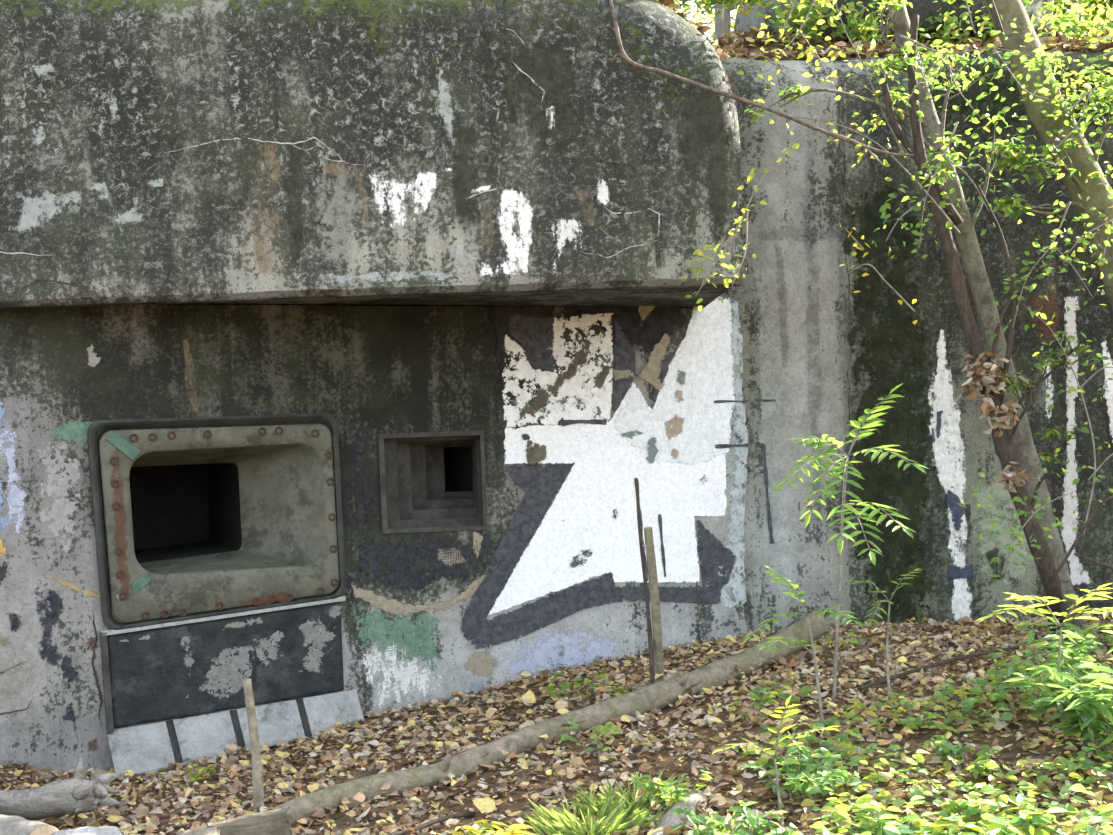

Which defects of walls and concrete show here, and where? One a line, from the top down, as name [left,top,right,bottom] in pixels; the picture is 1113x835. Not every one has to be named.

leakage [480,0,595,152]
crack [0,251,81,288]
crack [165,136,358,165]
peeling [315,160,533,284]
leakage [451,121,497,233]
peeling [552,219,582,268]
leakage [675,87,729,241]
peeling [520,339,593,420]
peeling [594,334,686,464]
leakage [753,267,777,504]
corrosion [111,449,132,601]
crack [87,610,103,726]